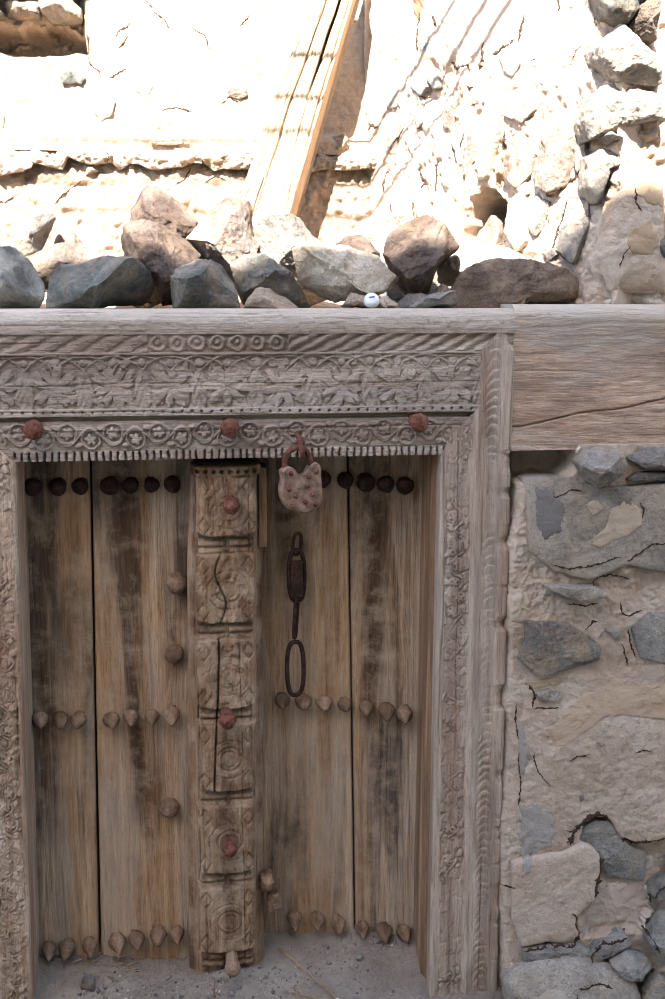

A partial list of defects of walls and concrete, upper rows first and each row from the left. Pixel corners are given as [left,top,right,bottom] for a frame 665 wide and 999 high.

crack [88,23,130,78]
crack [145,0,211,50]